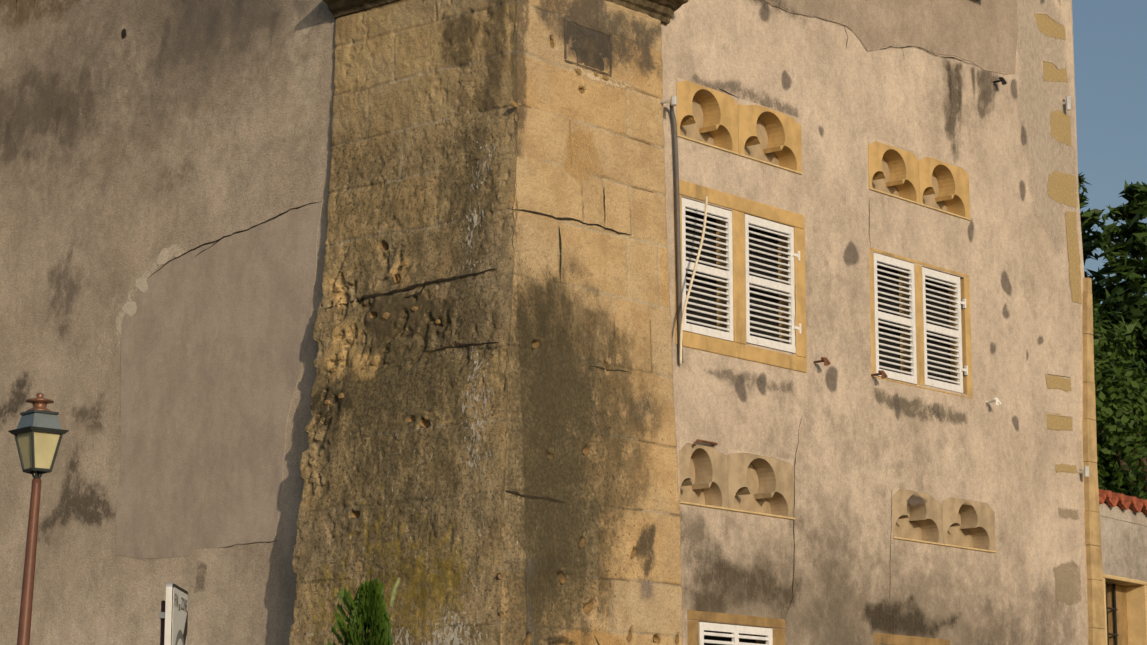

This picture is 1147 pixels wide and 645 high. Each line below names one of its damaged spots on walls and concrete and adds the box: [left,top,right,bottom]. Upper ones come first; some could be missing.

crack [765,1,979,66]
damp [946,65,1017,151]
crack [147,202,319,279]
damp [0,375,27,422]
damp [42,461,115,532]